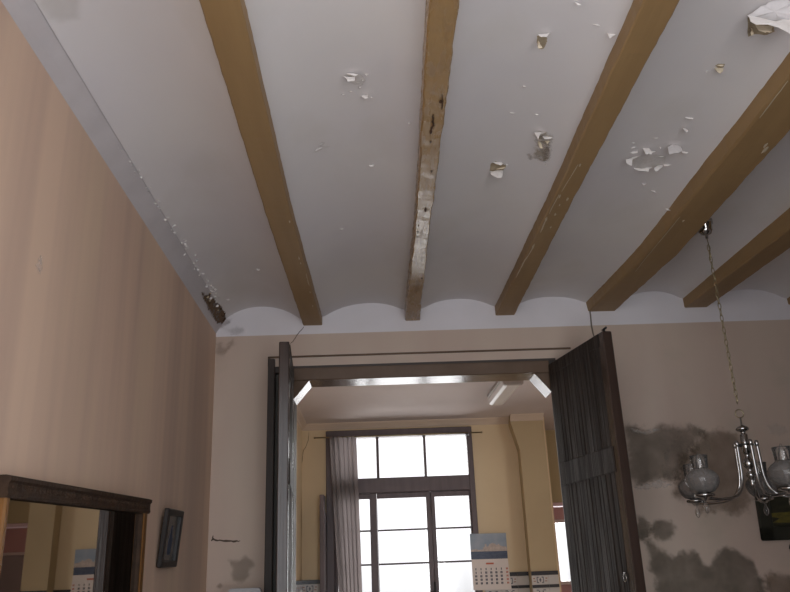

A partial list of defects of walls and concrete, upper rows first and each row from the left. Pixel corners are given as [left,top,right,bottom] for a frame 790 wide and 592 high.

peeling [747,0,790,37]
peeling [537,33,550,49]
peeling [341,73,373,99]
peeling [490,161,508,178]
peeling [534,132,553,166]
peeling [626,138,688,172]
leakage [202,290,226,324]
leakage [652,549,774,592]